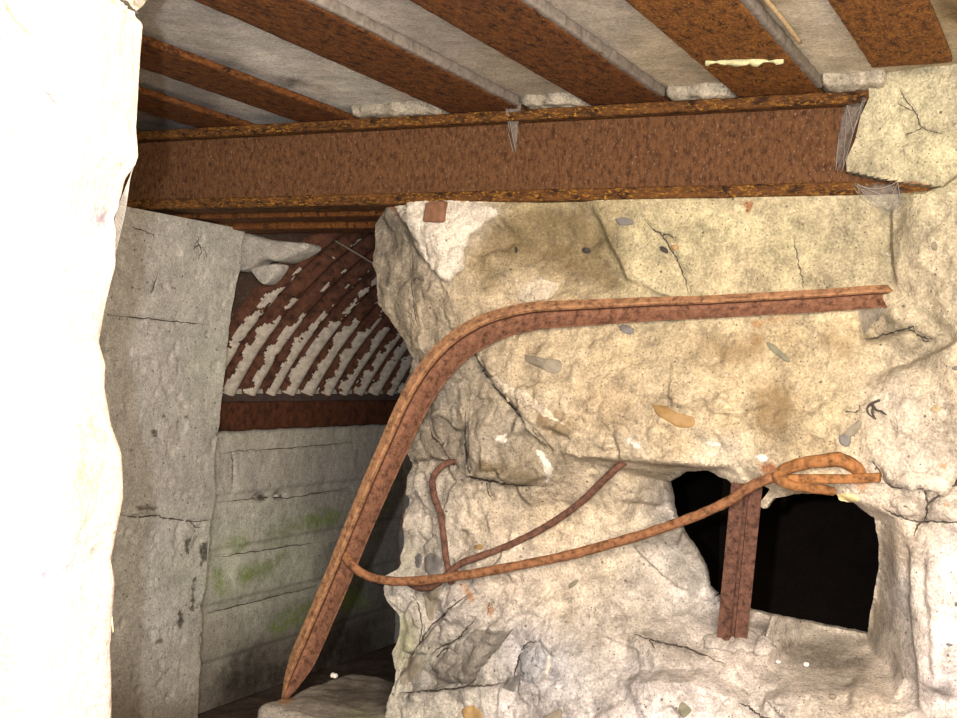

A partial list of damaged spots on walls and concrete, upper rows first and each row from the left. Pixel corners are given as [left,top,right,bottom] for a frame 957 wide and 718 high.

crack [896,90,942,136]
crack [646,220,690,295]
peeling [222,264,413,396]
crack [866,326,933,342]
crack [871,461,957,536]
crack [412,592,490,658]
crack [399,630,537,694]